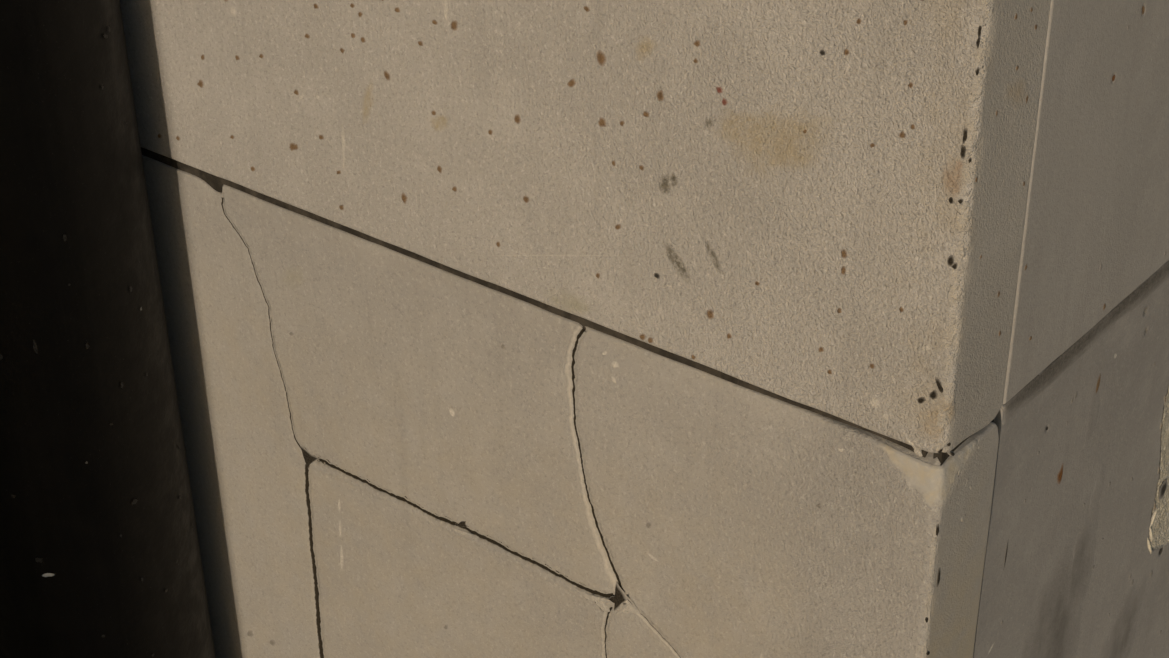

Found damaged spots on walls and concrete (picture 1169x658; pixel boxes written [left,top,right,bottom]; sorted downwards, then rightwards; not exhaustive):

crack [220,198,682,658]
peeling [1147,386,1169,556]